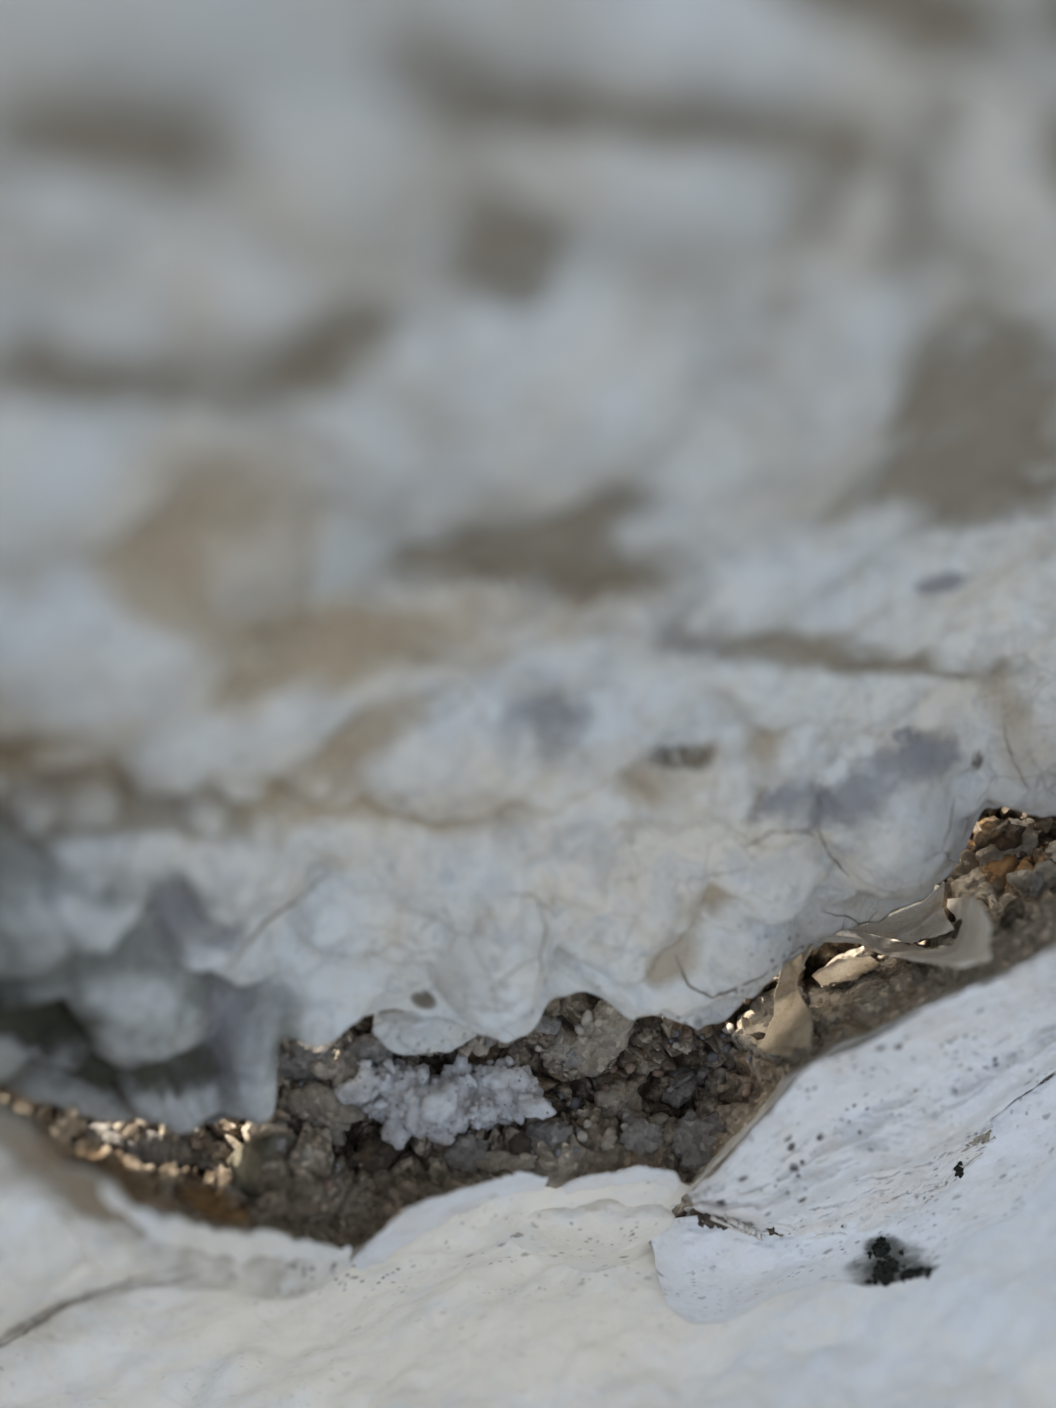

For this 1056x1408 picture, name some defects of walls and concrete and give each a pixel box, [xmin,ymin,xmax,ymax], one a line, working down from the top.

crack [745,785,849,877]
crack [822,911,888,931]
crack [676,947,800,999]
spalling [0,807,1056,1271]